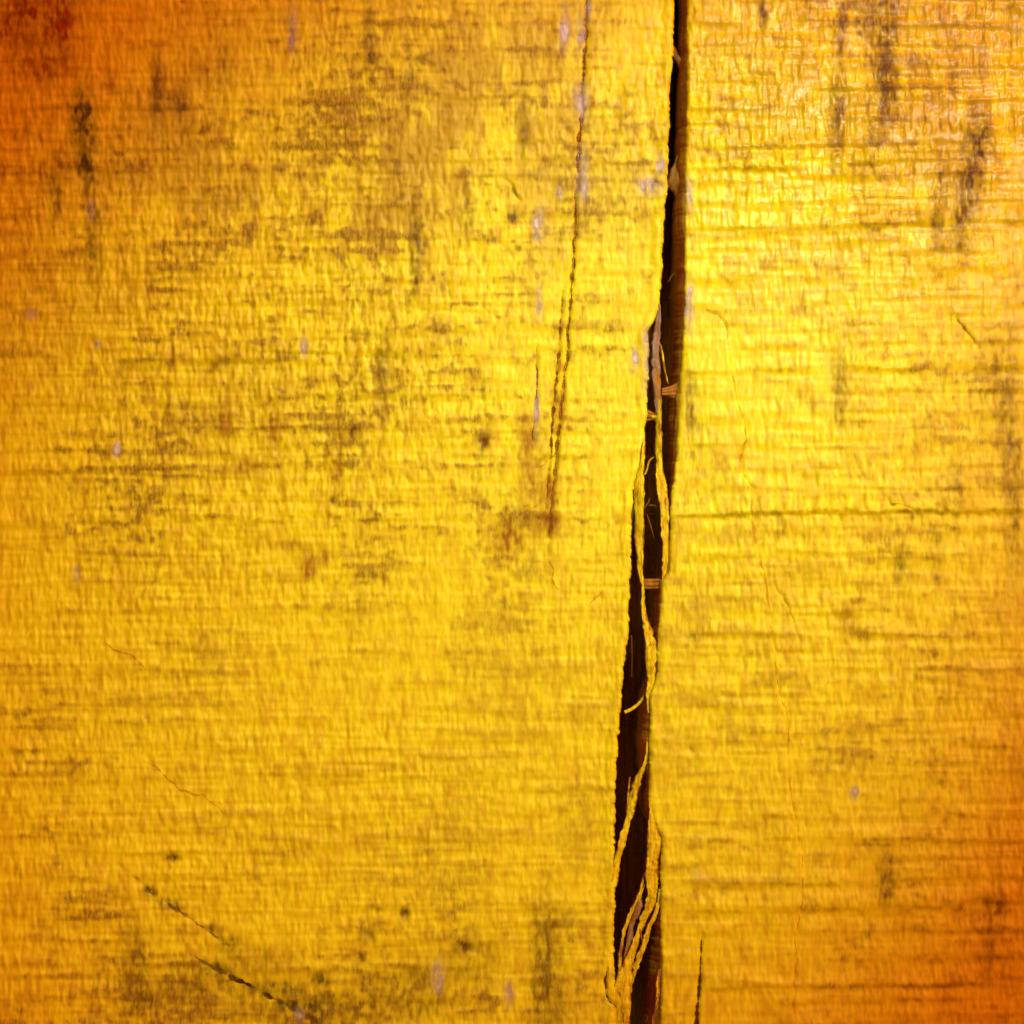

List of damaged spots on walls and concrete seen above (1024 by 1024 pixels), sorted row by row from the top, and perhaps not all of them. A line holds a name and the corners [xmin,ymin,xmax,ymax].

crack [531,0,589,535]
crack [604,0,688,1024]